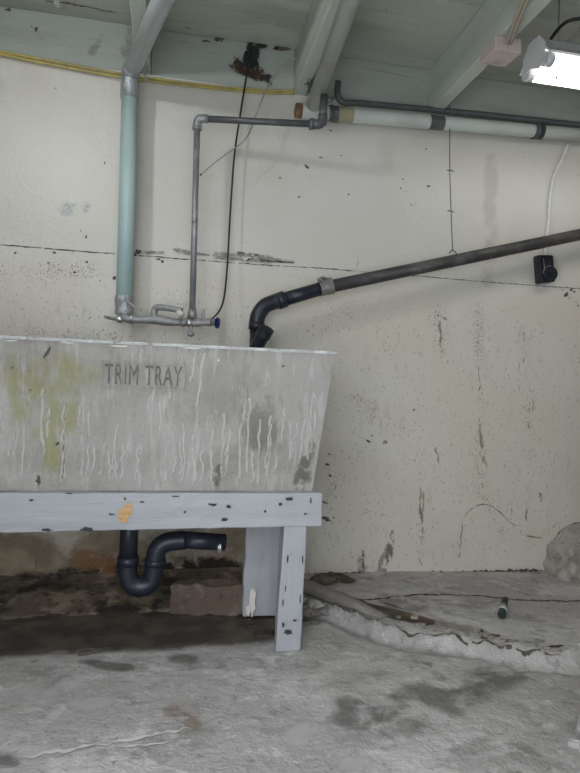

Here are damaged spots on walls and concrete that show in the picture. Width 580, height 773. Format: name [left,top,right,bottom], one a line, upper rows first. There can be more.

corrosion [230,57,264,81]
crack [6,245,115,254]
crack [138,255,362,272]
crack [414,275,580,289]
crack [419,566,544,574]
crack [321,594,580,657]